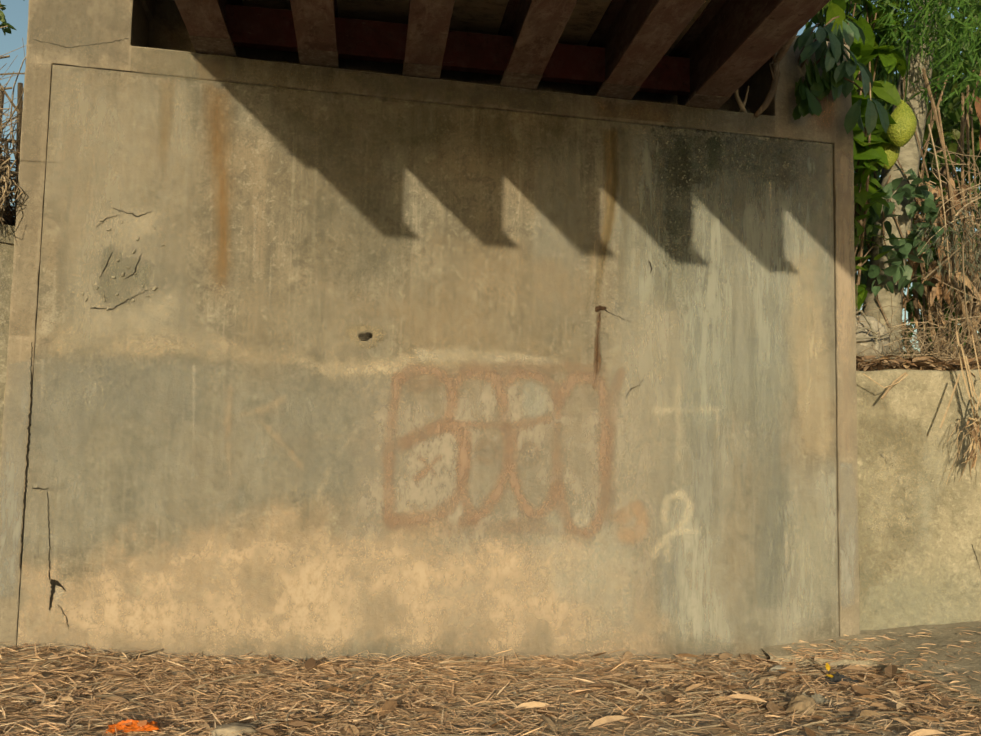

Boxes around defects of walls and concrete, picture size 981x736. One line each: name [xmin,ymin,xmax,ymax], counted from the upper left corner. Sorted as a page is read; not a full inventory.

crack [20,342,69,629]
peeling [82,237,158,311]
water stain [330,125,822,649]